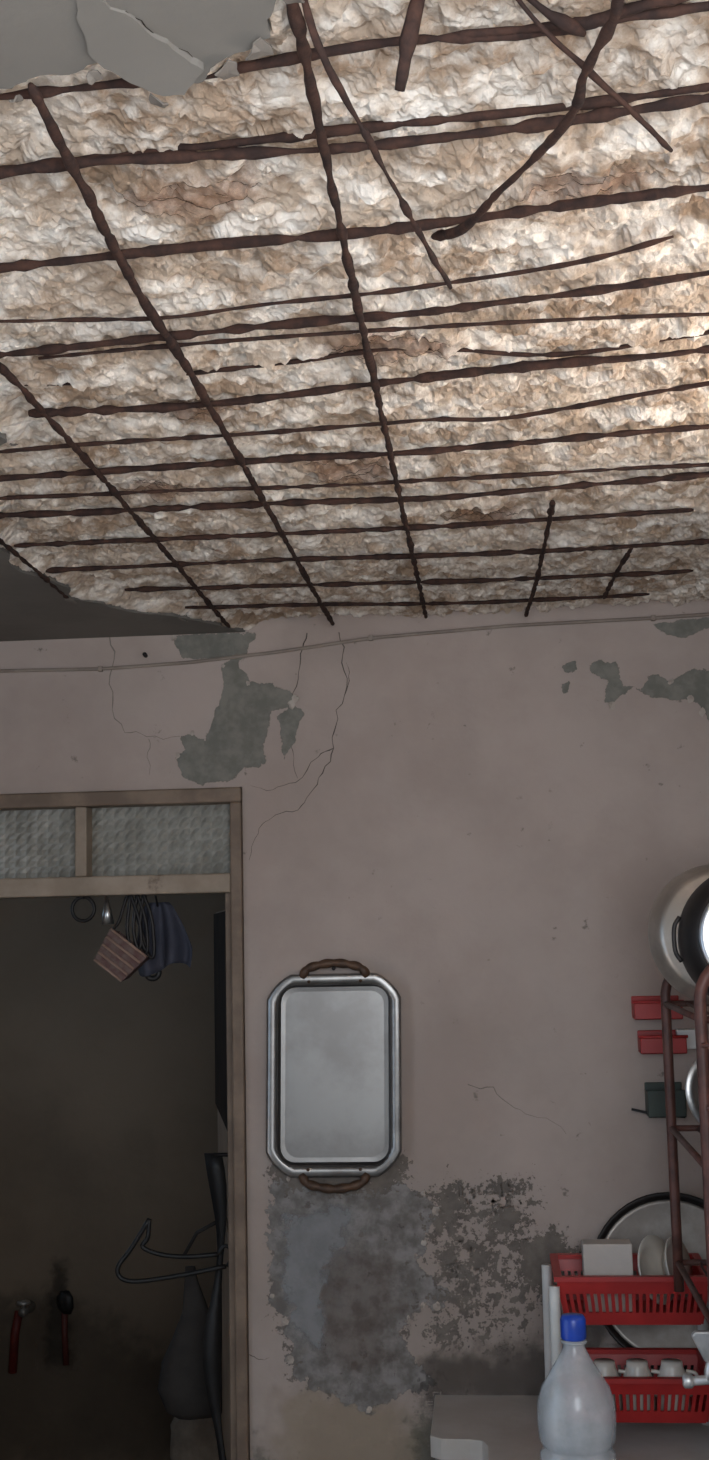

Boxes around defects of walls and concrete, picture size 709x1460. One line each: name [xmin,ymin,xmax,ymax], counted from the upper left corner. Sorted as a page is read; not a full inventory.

corrosion [130,171,251,217]
corrosion [527,169,638,198]
corrosion [330,335,445,361]
peeling [0,0,709,786]
corrosion [321,456,388,482]
corrosion [452,507,516,527]